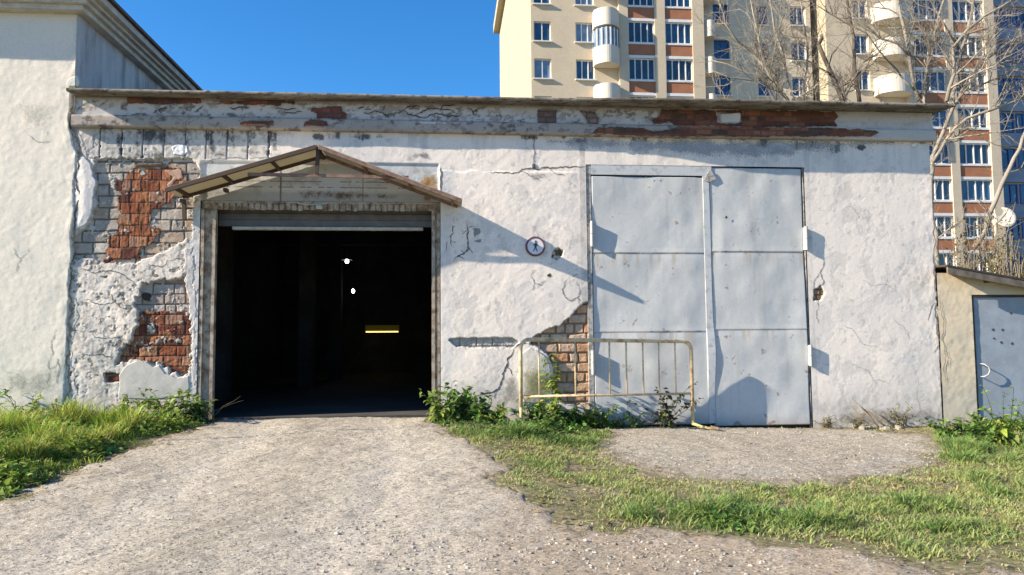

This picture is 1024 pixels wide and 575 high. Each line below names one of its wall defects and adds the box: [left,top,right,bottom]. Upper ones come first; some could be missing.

spalling [304,106,347,126]
crack [359,104,479,118]
spalling [537,109,557,123]
flaking render [550,109,894,157]
crack [488,140,588,179]
flaking render [73,128,200,264]
crack [445,226,475,261]
flaking render [95,269,193,383]
crack [477,343,526,399]
flaking render [531,302,589,408]